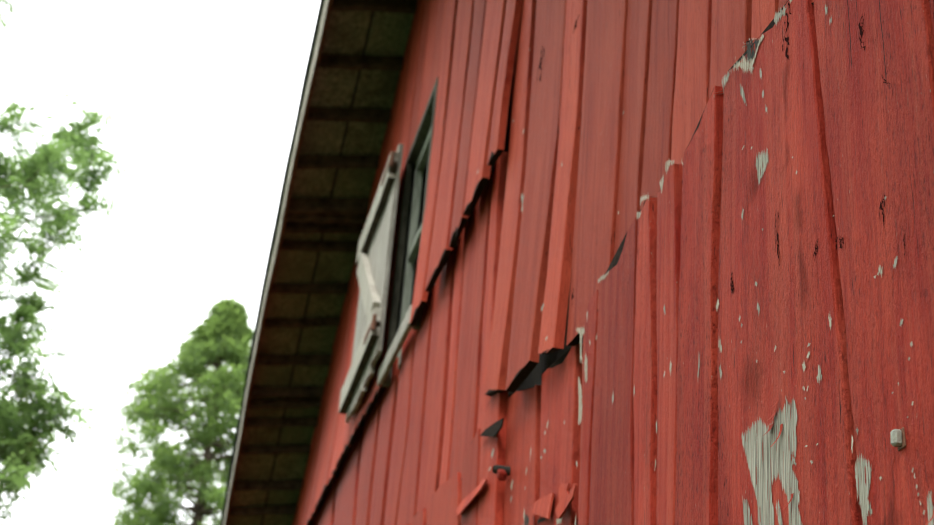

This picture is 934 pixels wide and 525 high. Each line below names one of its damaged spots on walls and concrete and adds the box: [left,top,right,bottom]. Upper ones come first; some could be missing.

spalling [734,34,764,74]
peeling [742,145,768,184]
peeling [742,365,822,525]
peeling [851,428,882,525]
peeling [912,467,934,525]